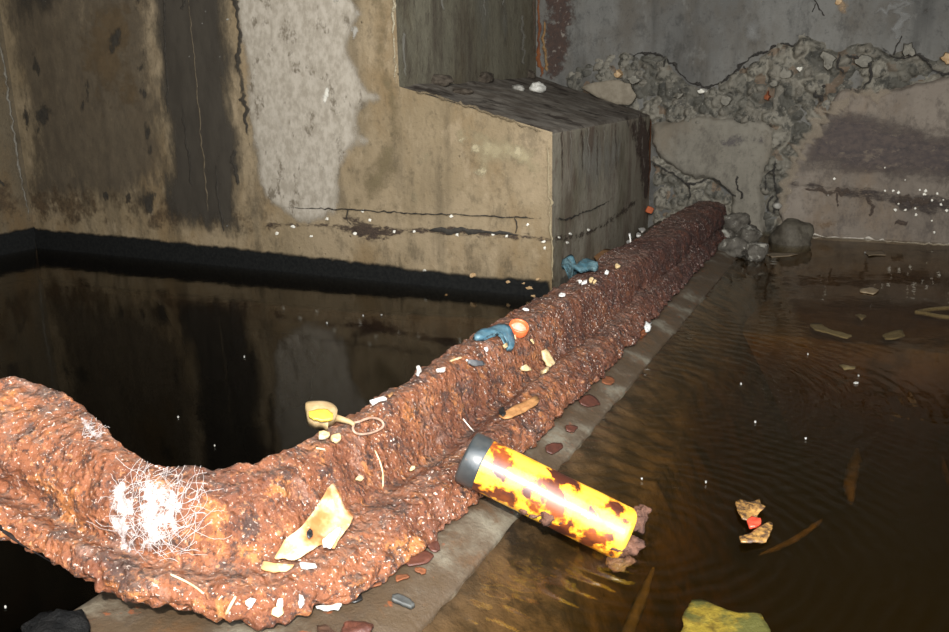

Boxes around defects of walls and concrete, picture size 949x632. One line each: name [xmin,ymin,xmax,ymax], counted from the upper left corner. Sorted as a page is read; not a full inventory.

rust [536,0,575,78]
water stain [0,0,550,318]
spalling [566,33,949,244]
water stain [267,202,635,249]
crack [295,201,609,233]
crack [651,161,779,214]
water stain [792,177,949,246]
rust [545,443,563,454]
rust [372,540,440,588]